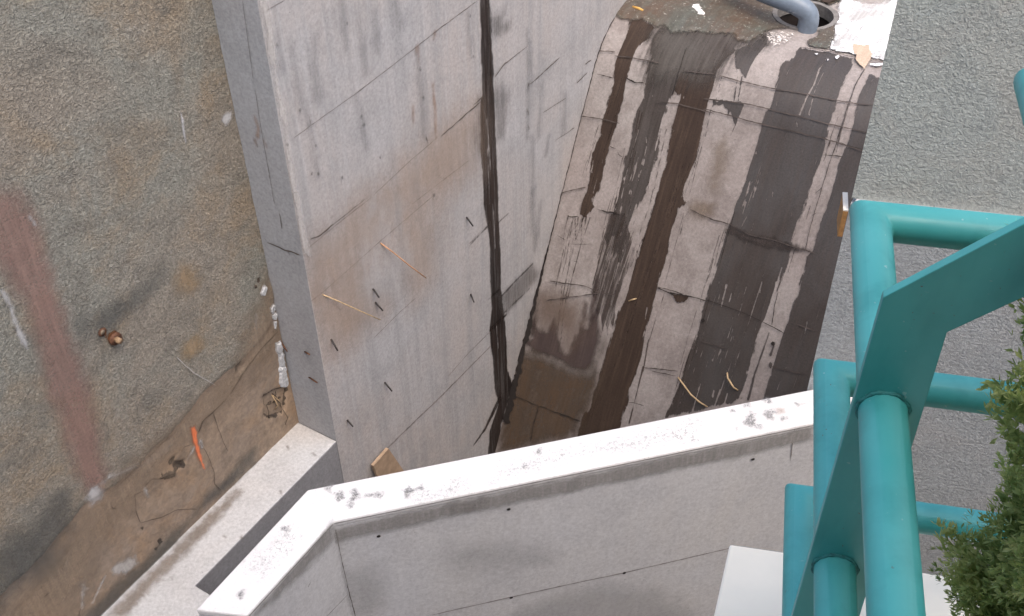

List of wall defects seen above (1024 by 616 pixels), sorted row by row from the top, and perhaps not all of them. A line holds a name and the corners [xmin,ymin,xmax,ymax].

water stain [474,0,535,454]
water stain [527,0,897,436]